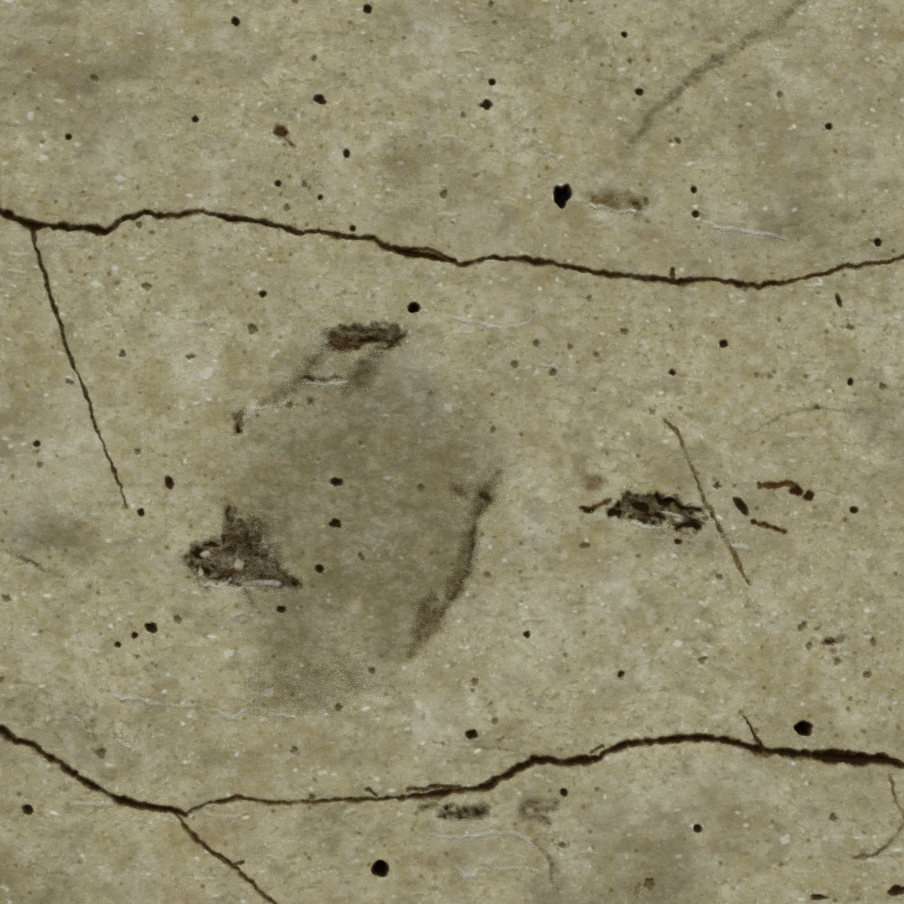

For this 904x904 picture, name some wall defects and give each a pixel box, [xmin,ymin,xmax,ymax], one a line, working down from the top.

crack [673,57,723,98]
spalling [291,322,406,389]
crack [0,209,904,507]
spalling [185,506,299,588]
spalling [607,492,705,531]
crack [664,420,749,584]
crack [0,716,904,904]